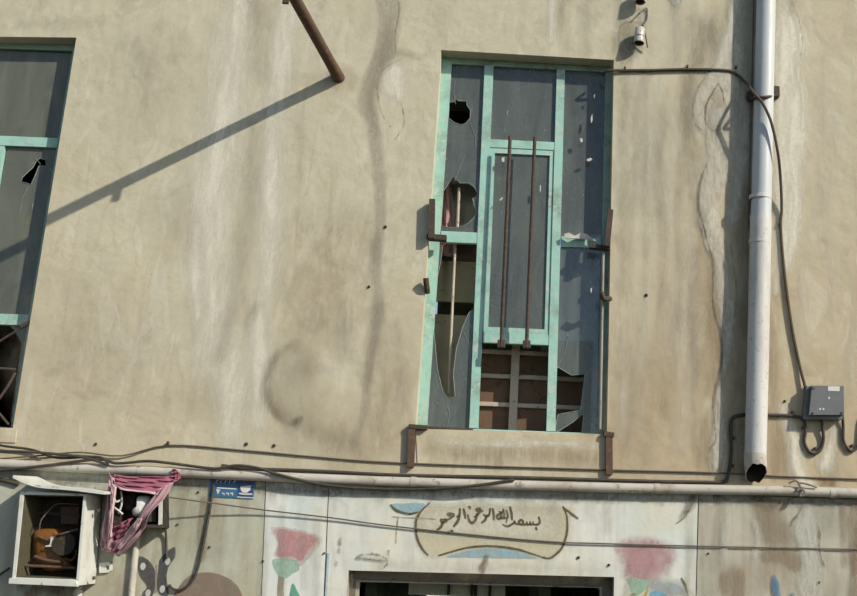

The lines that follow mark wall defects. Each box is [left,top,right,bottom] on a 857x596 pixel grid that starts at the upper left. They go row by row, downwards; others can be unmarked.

crack [377,44,406,114]